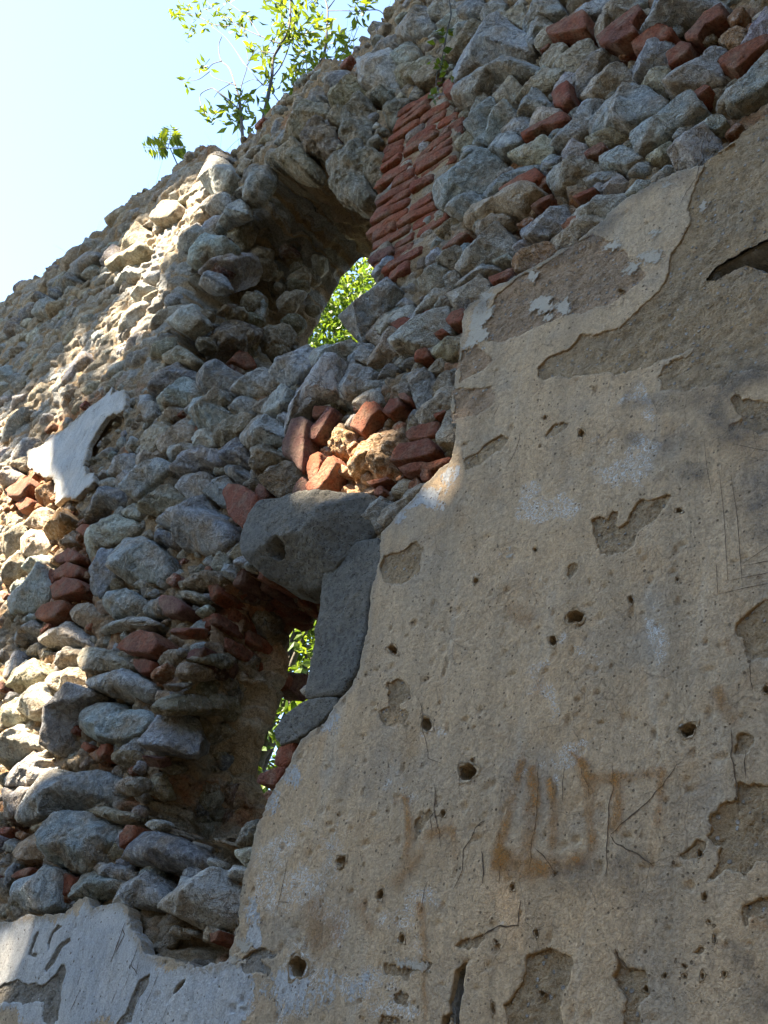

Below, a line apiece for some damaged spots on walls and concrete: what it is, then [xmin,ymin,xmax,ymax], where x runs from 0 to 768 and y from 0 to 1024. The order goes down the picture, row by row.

flaking render [451,114,768,424]
flaking render [730,395,768,434]
flaking render [464,435,509,470]
flaking render [593,495,671,556]
flaking render [381,542,423,585]
flaking render [736,600,768,660]
flaking render [375,679,411,730]
crack [528,764,677,874]
flaking render [680,782,768,879]
flaking render [227,934,280,976]
flaking render [505,949,573,1024]
flaking render [615,956,649,1024]